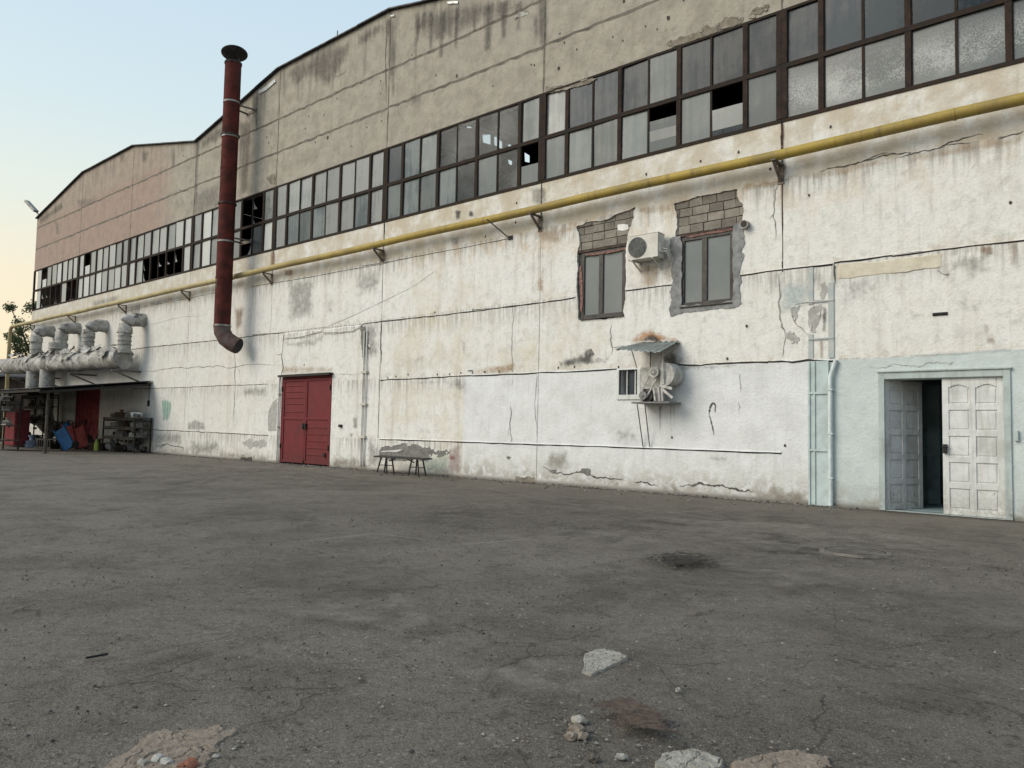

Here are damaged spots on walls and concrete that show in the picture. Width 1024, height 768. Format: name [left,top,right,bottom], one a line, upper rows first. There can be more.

crack [824,131,1023,171]
peeling [785,282,828,344]
rust [636,332,664,341]
flaking render [379,443,450,461]
crack [544,467,657,486]
crack [682,482,751,492]